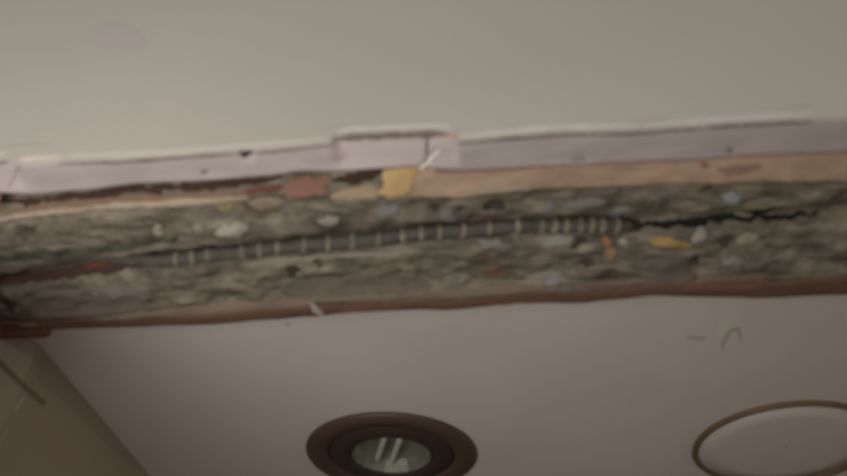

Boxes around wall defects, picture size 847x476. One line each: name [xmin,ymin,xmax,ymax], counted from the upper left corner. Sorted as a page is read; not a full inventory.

flaking render [338,123,451,131]
flaking render [462,113,815,137]
crack [59,153,235,165]
flaking render [18,137,326,162]
crack [257,121,812,174]
crack [0,161,282,207]
crack [331,169,382,186]
spalling [14,223,35,241]
spalling [109,183,643,269]
crack [643,207,818,230]
spalling [286,265,301,278]
spalling [580,259,618,280]